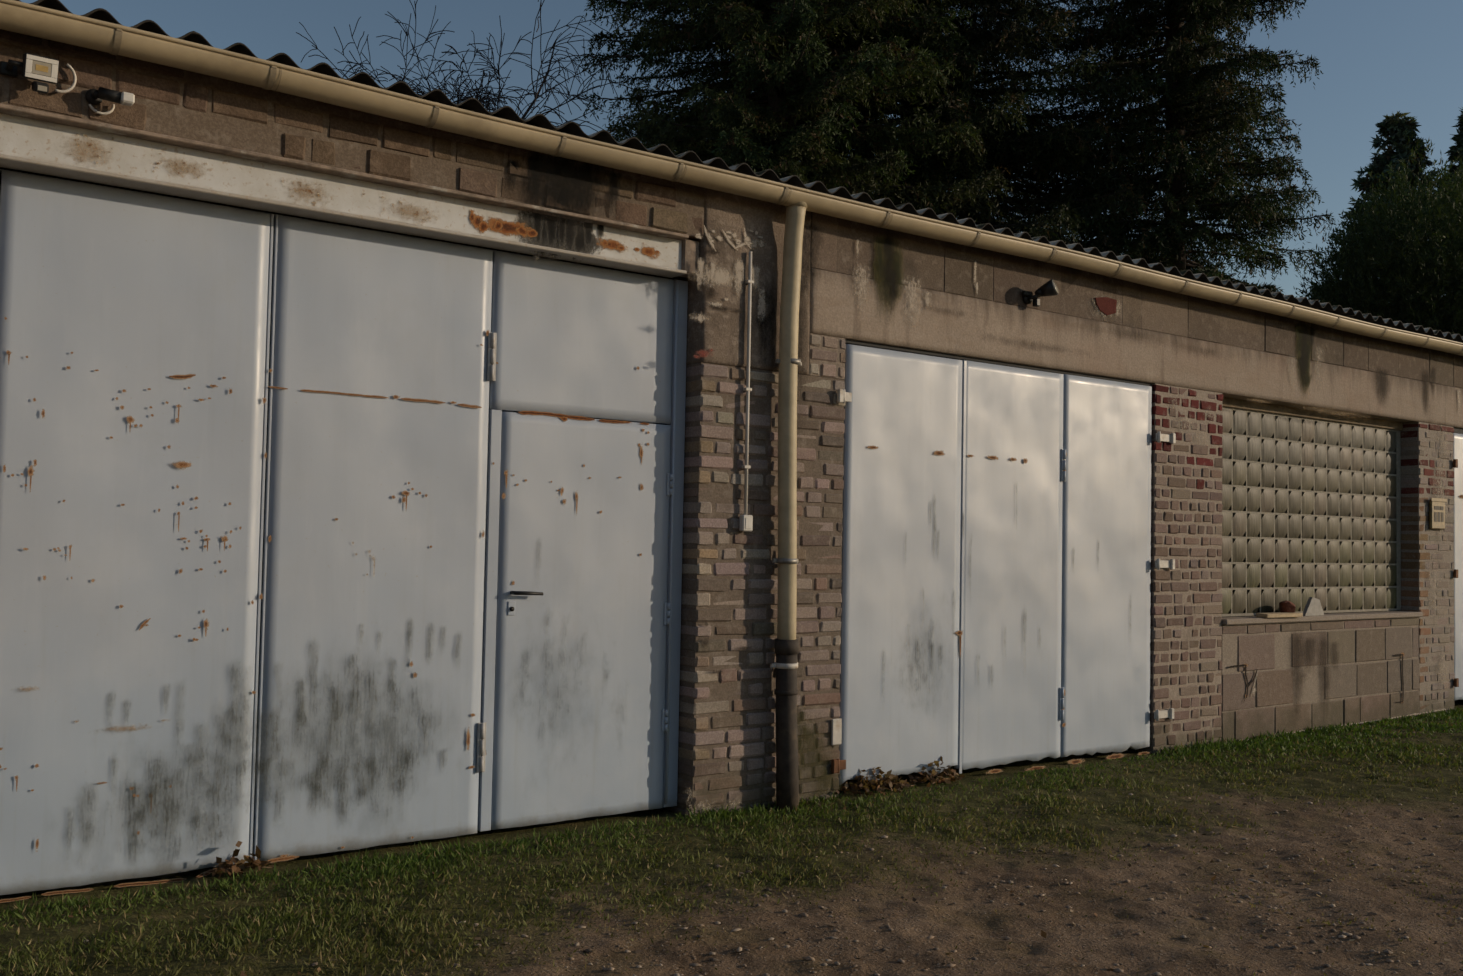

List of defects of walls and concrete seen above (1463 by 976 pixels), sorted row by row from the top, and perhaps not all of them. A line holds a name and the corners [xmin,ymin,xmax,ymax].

corrosion [469,209,538,238]
leakage [509,155,619,259]
corrosion [596,238,660,259]
leakage [856,238,930,321]
leakage [1288,325,1322,386]
corrosion [169,374,232,401]
corrosion [116,388,181,431]
corrosion [3,460,37,490]
corrosion [158,445,241,574]